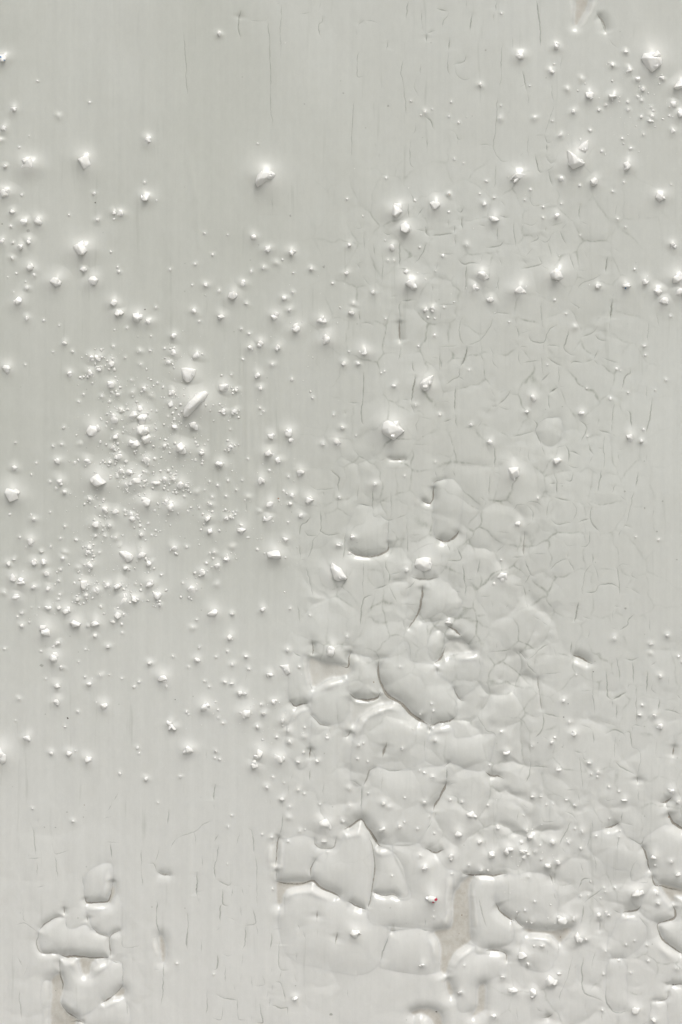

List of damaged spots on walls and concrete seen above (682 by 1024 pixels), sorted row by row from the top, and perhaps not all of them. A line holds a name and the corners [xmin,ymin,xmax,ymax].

crack [361,666,451,723]
crack [276,819,379,908]
crack [643,849,679,952]